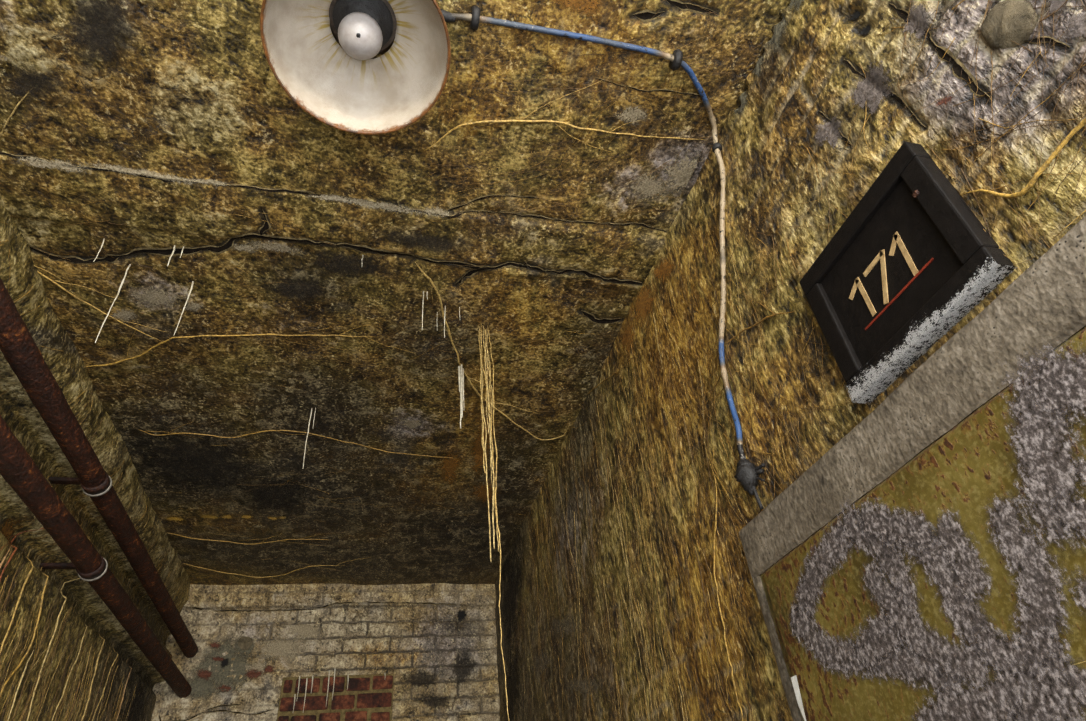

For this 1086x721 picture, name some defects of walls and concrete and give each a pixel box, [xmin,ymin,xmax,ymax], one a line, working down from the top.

crack [0,152,667,285]
crack [581,310,622,324]
spalling [187,641,274,700]
water stain [450,650,478,683]
water stain [403,671,450,709]